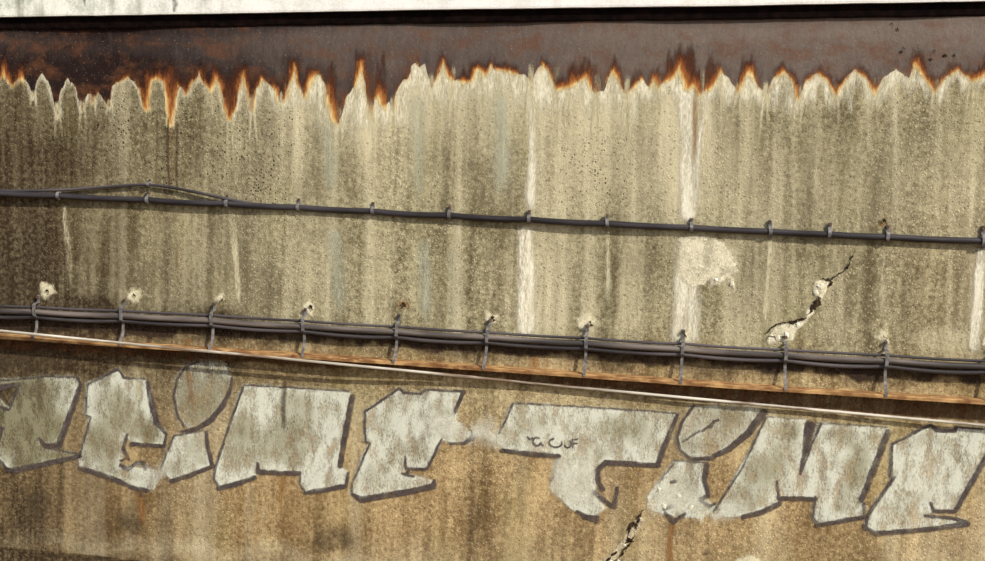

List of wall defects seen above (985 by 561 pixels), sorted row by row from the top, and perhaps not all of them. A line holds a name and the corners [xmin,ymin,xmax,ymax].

leakage [16,73,144,120]
rust [139,60,338,128]
rust [437,56,518,85]
rust [541,48,722,95]
rust [775,64,878,101]
rust [910,54,985,91]
leakage [167,63,985,221]
leakage [518,227,535,334]
leakage [673,238,699,343]
crack [766,255,853,338]
leakage [969,249,985,350]
crack [606,510,644,561]